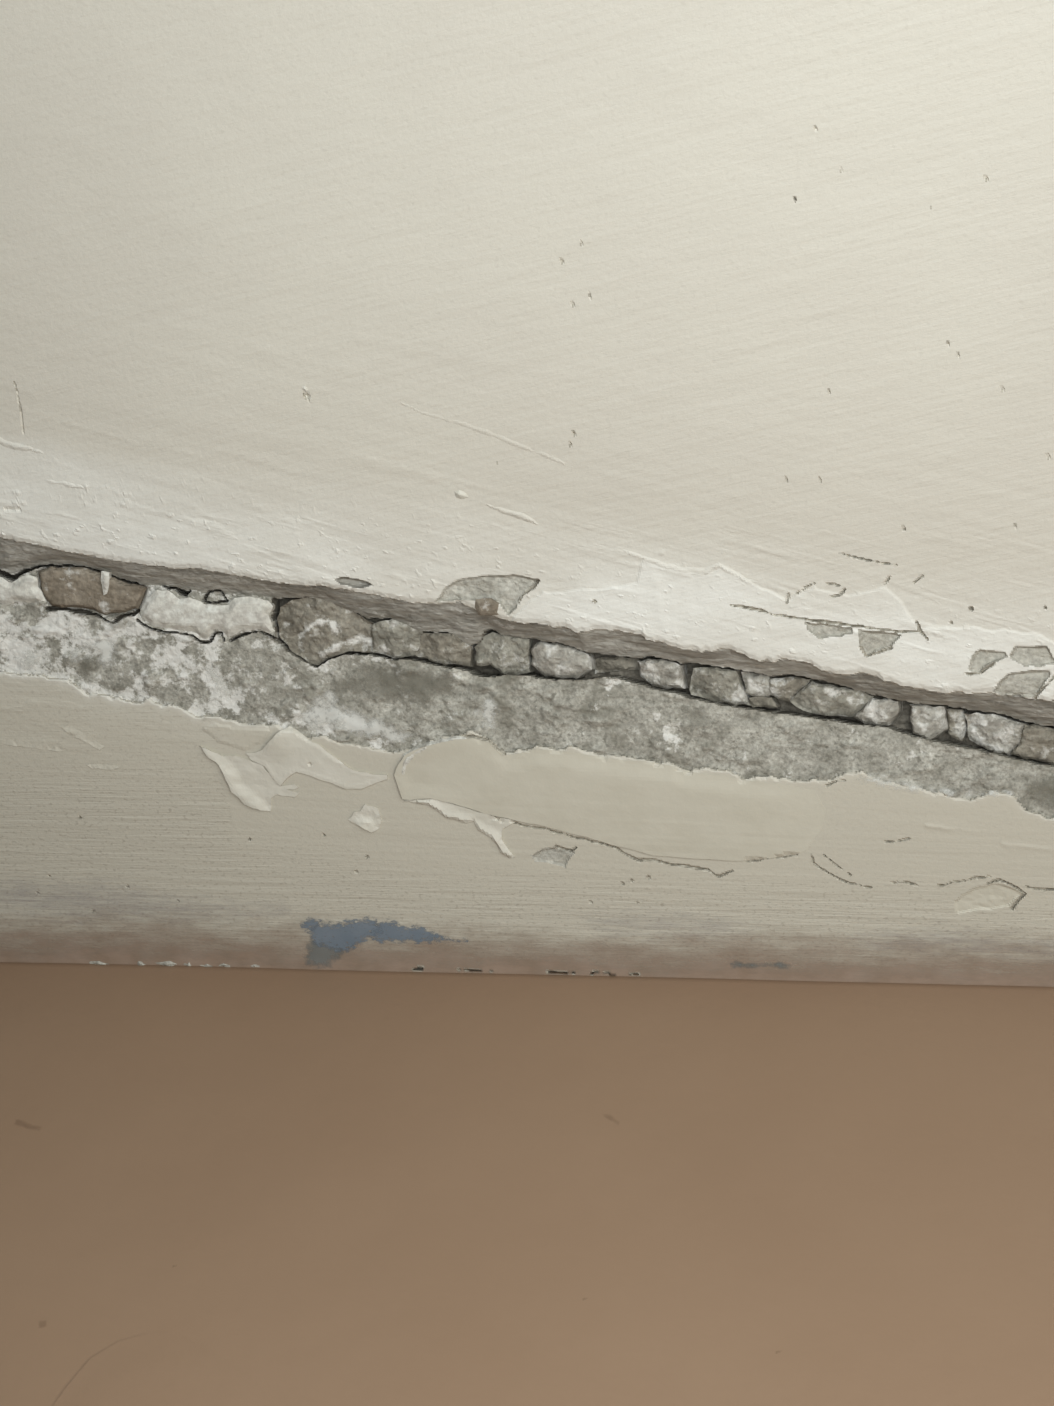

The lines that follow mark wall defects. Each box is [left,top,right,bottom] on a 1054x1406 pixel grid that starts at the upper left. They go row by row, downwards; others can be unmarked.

crack [0,564,1054,765]
flaking render [0,537,1054,869]
crack [515,823,988,887]
flaking render [954,878,1026,914]